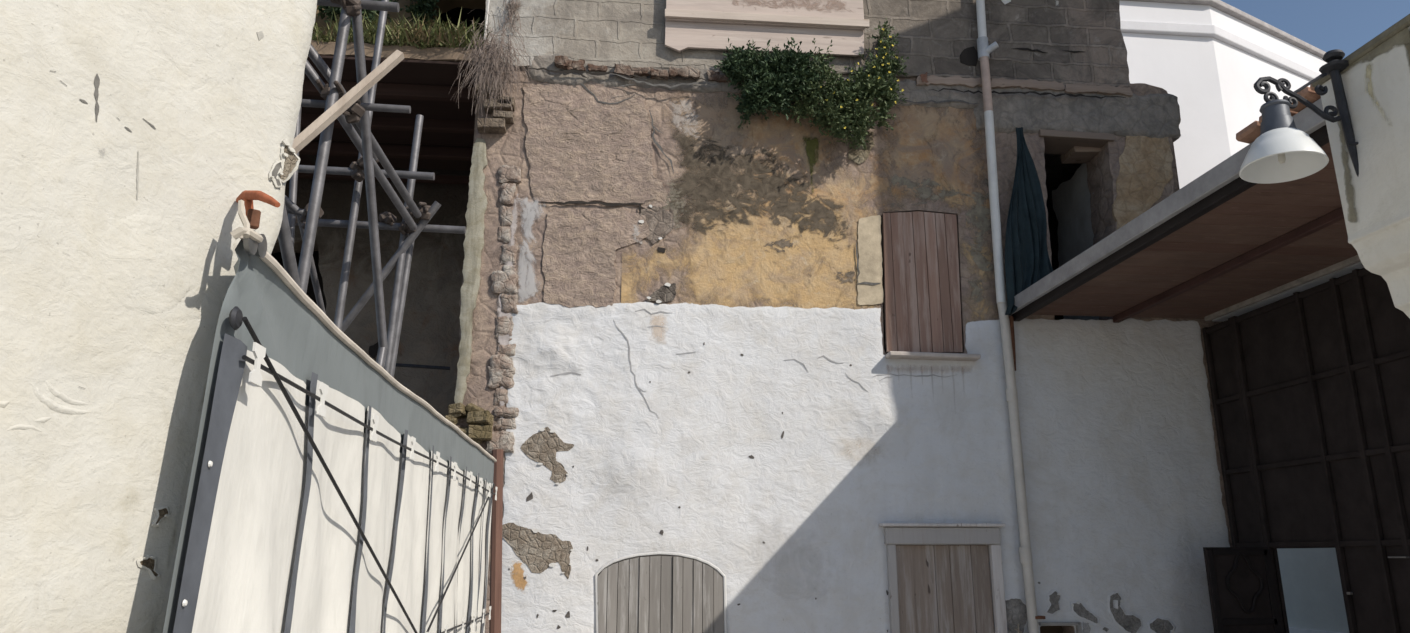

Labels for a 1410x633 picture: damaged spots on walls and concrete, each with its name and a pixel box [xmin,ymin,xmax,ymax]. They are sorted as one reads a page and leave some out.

damp [1340,26,1410,97]
spalling [475,83,515,134]
damp [662,129,850,252]
spalling [634,205,675,253]
spalling [647,283,676,303]
peeling [485,165,574,485]
crack [613,309,694,418]
peeling [502,523,598,580]
peeling [1005,597,1028,633]
peeling [1038,582,1176,633]